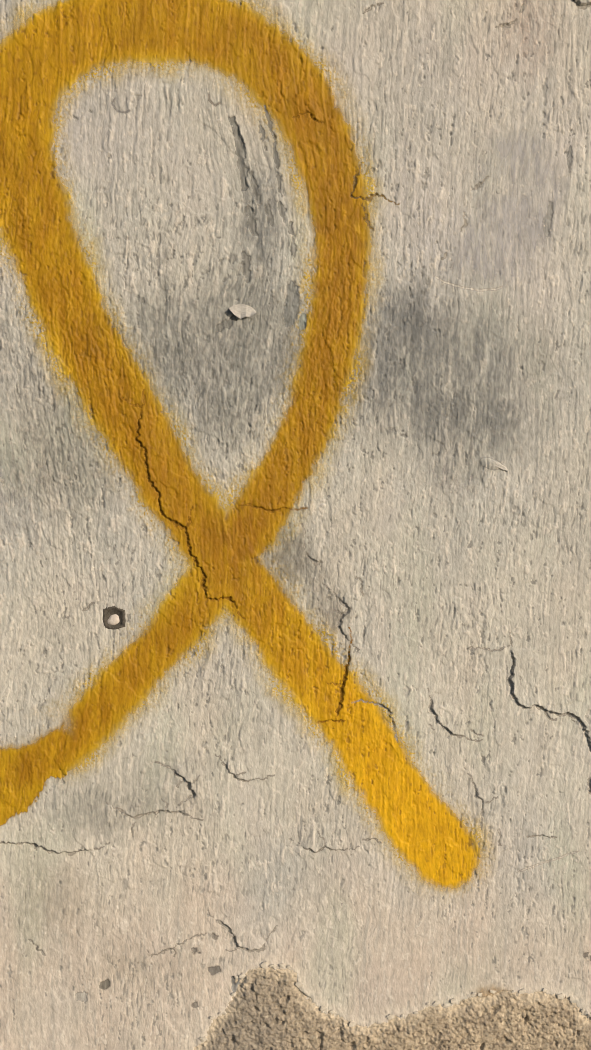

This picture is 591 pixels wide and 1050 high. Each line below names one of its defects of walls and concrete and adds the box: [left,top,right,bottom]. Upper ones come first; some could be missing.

crack [573,0,591,9]
crack [122,389,245,619]
crack [428,688,483,742]
crack [467,636,591,752]
crack [0,754,274,857]
crack [465,768,501,846]
crack [151,910,276,957]
flaking render [194,961,591,1050]